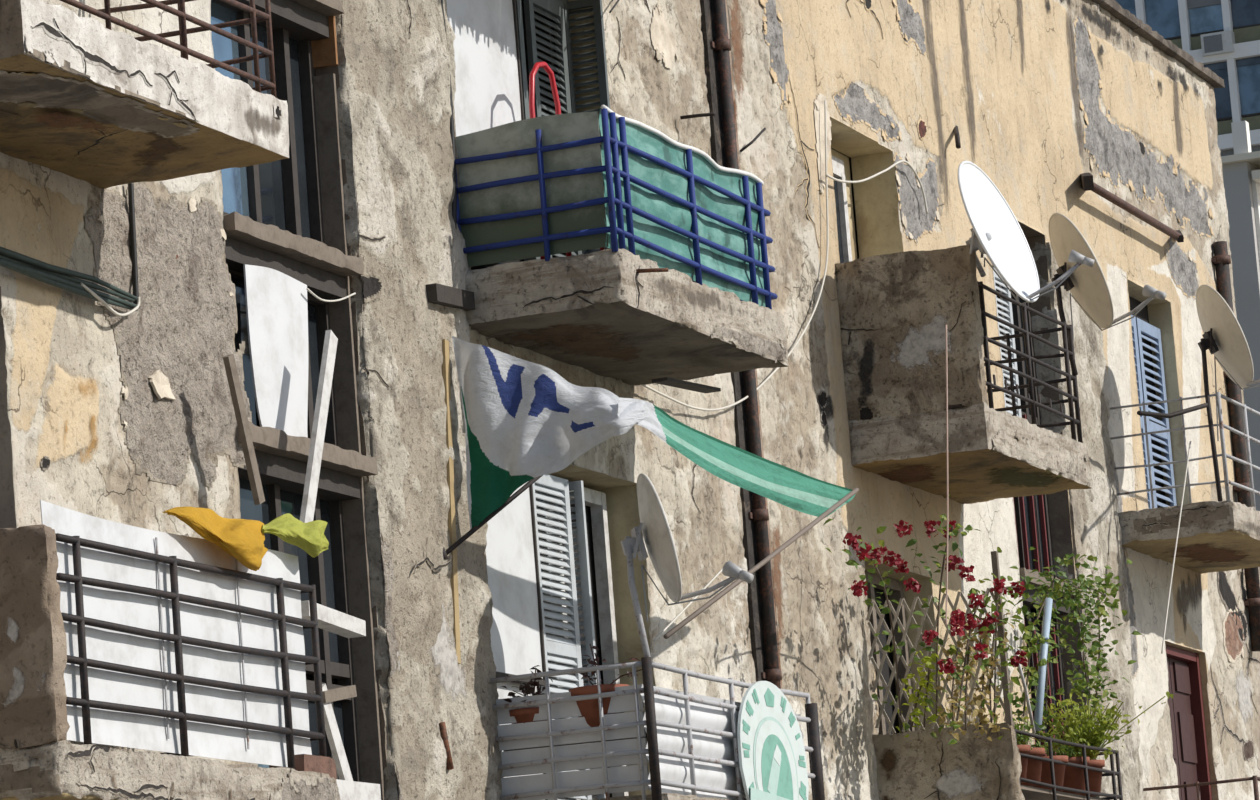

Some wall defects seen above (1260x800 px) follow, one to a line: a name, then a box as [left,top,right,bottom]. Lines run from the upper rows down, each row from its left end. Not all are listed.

crack [845,0,883,39]
flaking render [892,0,926,55]
crack [31,18,196,120]
water stain [136,131,186,166]
flaking render [814,81,940,245]
flaking render [1074,17,1214,298]
water stain [987,467,1061,487]
rust [772,528,784,669]
crack [0,739,186,800]
crack [924,738,944,800]
crack [994,759,1002,800]